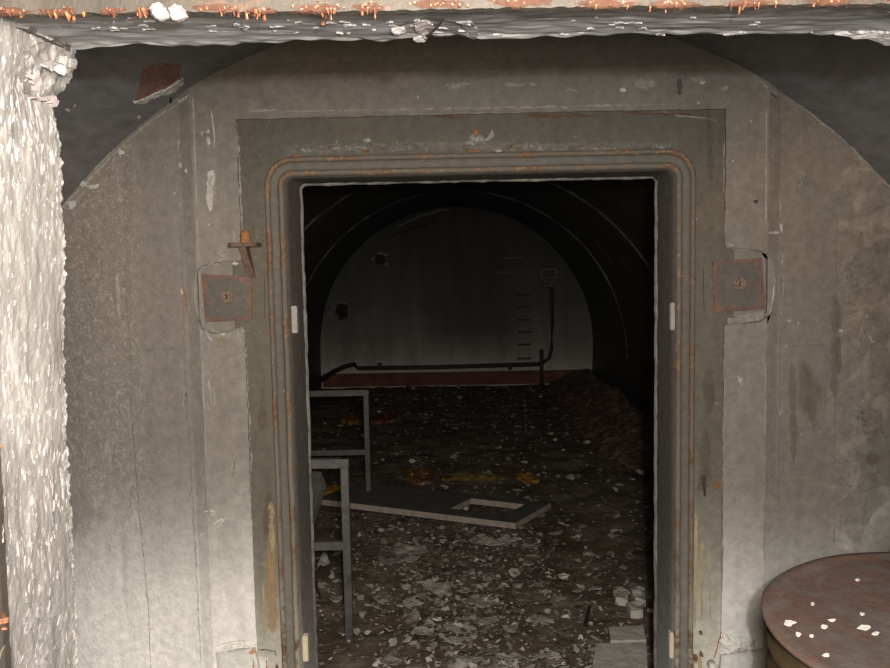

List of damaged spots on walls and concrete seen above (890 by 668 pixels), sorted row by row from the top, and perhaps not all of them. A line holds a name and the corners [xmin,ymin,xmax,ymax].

peeling [92,7,156,31]
peeling [223,0,380,35]
spalling [387,19,478,42]
peeling [608,22,665,36]
peeling [723,1,761,36]
spalling [834,31,890,46]
spalling [18,41,77,112]
peeling [133,62,243,516]
corrosion [693,514,711,635]
corrosion [693,632,722,668]